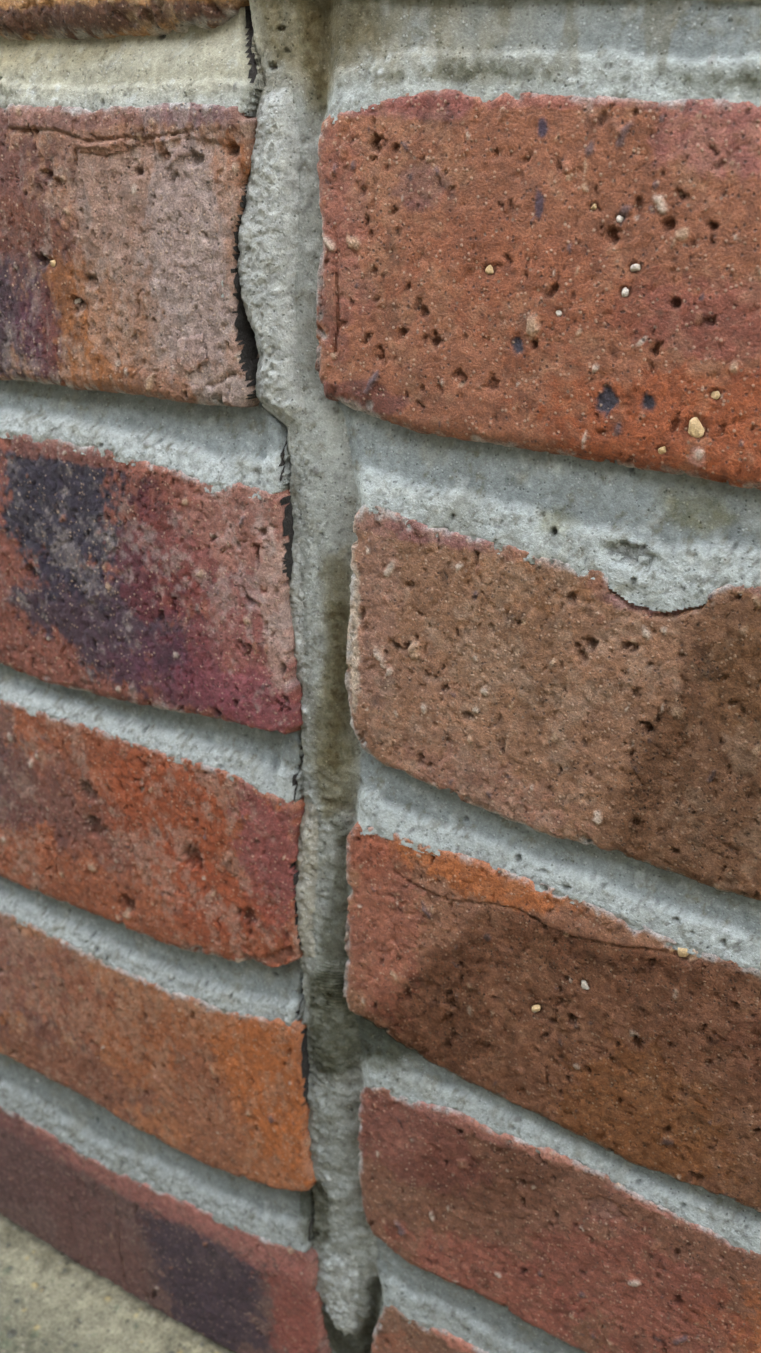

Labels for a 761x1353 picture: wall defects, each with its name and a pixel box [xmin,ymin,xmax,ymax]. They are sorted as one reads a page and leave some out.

crack [245,6,257,83]
crack [11,127,39,135]
crack [231,184,259,400]
crack [332,272,340,354]
crack [278,436,294,581]
spalling [604,543,657,569]
spalling [618,595,702,618]
crack [292,745,304,803]
crack [289,862,301,946]
crack [295,983,311,1106]
crack [307,1192,315,1242]